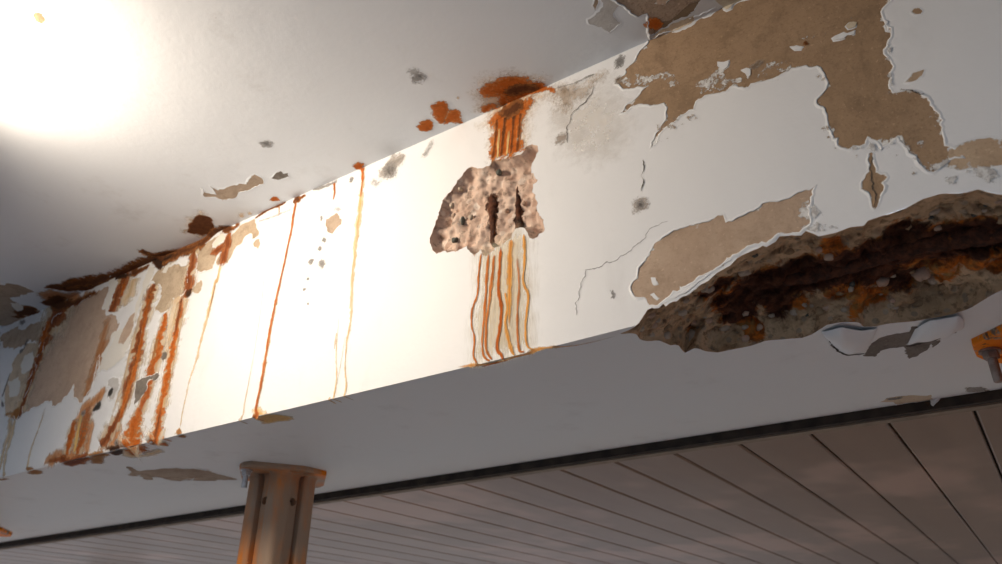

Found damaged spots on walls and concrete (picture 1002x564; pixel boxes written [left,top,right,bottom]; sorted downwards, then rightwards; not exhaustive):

peeling [0,282,135,422]
peeling [133,351,167,407]
corrosion [0,180,337,480]
peeling [151,218,262,315]
corrosion [328,162,365,404]
corrosion [416,97,463,132]
spalling [430,144,545,256]
corrosion [477,74,555,162]
corrosion [464,235,574,368]
spalling [586,0,1002,359]